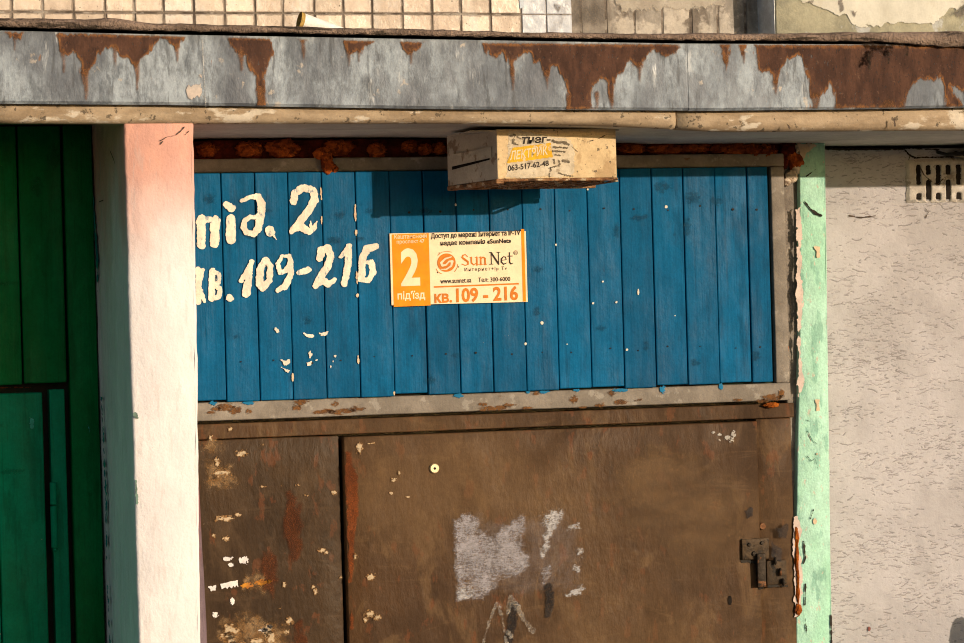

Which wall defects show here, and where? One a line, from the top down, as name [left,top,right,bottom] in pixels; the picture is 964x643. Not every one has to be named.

corrosion [56,33,185,99]
corrosion [228,38,274,105]
corrosion [482,43,680,109]
corrosion [720,42,964,108]
peeling [795,201,822,397]
peeling [792,516,803,617]
peeling [218,616,286,643]